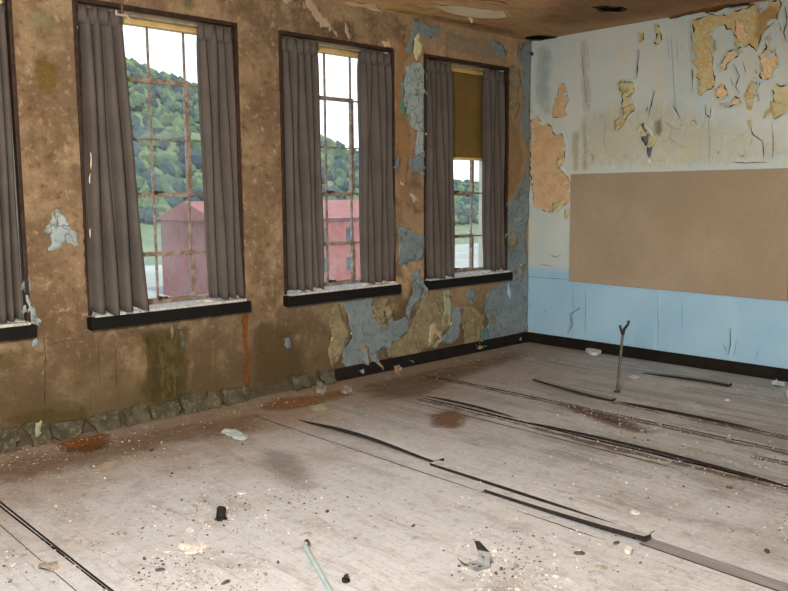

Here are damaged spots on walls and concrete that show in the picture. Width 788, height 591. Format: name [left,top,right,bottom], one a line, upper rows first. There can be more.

peeling [689,0,788,128]
peeling [44,209,79,251]
peeling [328,20,571,374]
leakage [142,326,185,402]